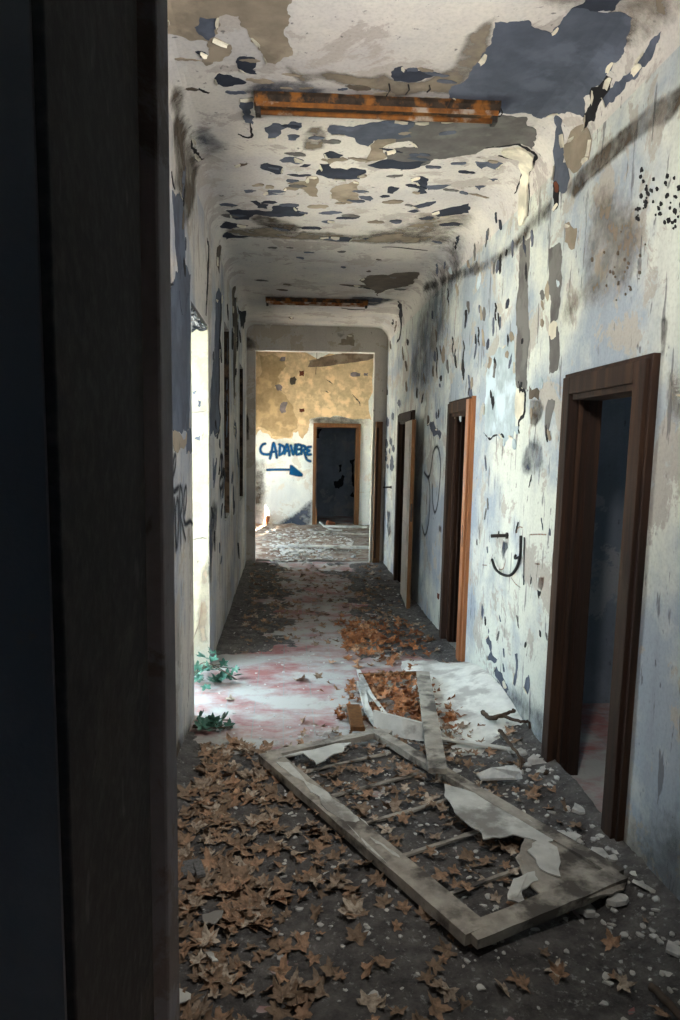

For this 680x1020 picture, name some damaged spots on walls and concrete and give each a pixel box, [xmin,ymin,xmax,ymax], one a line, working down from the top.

leakage [627,0,667,16]
peeling [167,0,314,124]
flaking render [191,139,203,162]
peeling [216,0,661,273]
peeling [171,190,246,454]
peeling [256,334,373,440]
peeling [339,270,420,296]
peeling [427,421,441,439]
peeling [480,222,577,450]